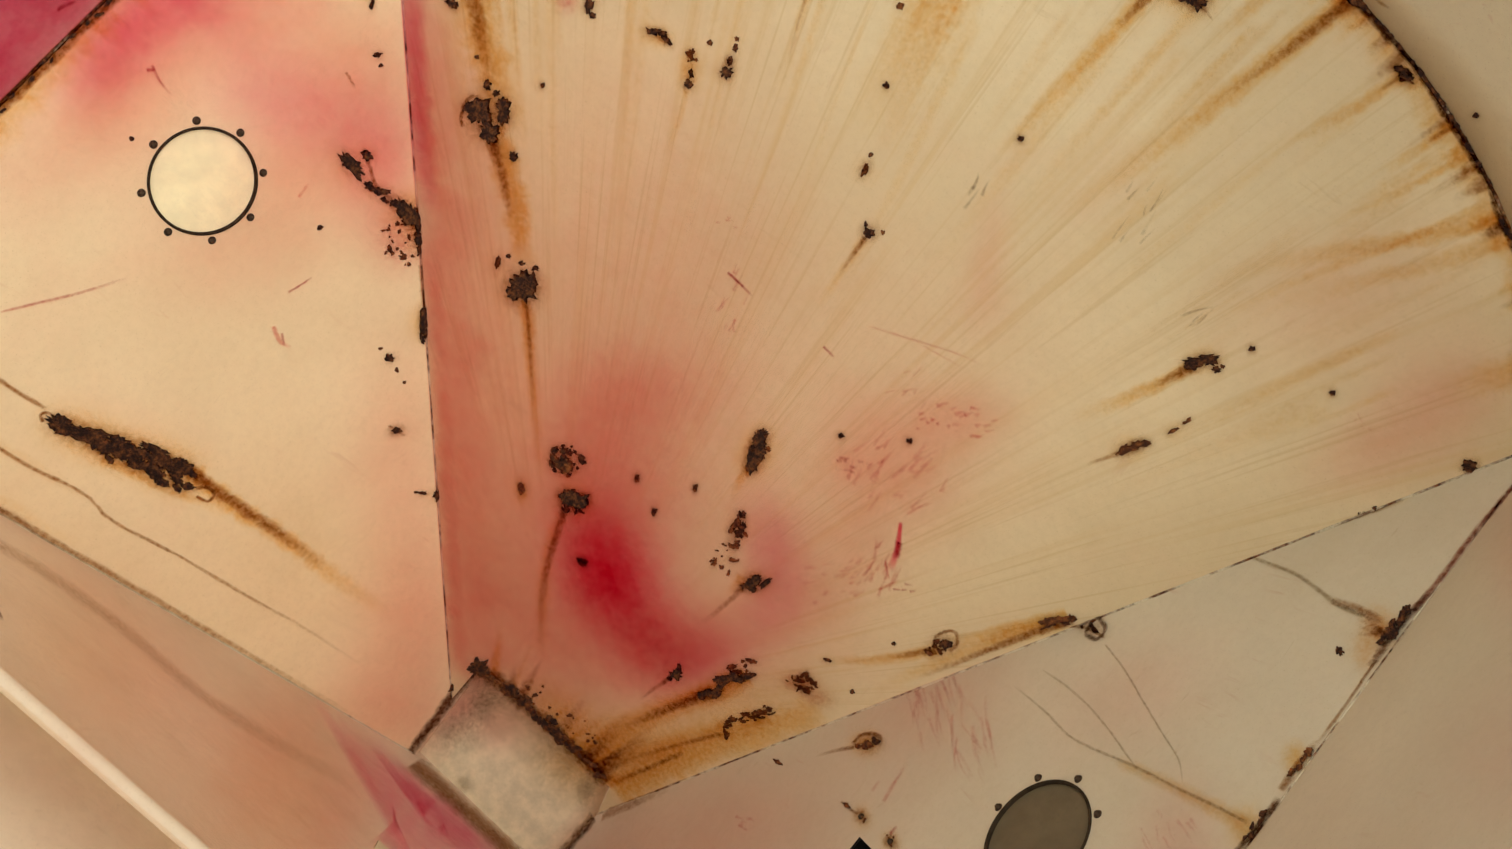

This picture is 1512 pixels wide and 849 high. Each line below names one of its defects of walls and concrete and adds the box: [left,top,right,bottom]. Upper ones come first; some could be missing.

rust [460,79,519,186]
rust [1311,0,1512,249]
rust [337,150,428,344]
rust [494,254,540,339]
rust [1178,354,1225,375]
rust [0,380,283,535]
rust [549,444,590,518]
rust [745,428,771,476]
rust [709,510,772,593]
rust [1374,604,1417,658]
rust [656,658,758,714]
rust [1237,747,1313,849]